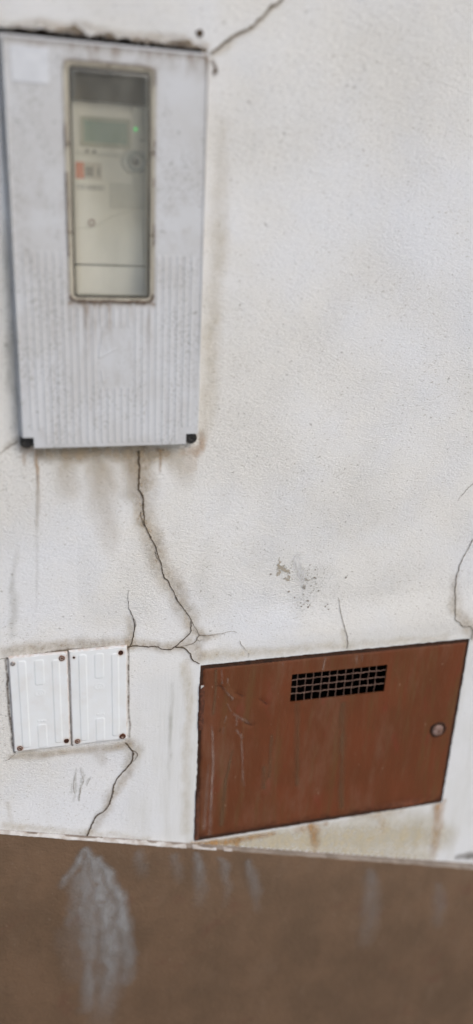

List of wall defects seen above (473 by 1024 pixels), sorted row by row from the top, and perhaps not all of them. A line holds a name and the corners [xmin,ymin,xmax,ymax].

crack [210,0,283,55]
crack [127,451,249,664]
crack [455,540,473,640]
crack [86,743,138,836]
leakage [77,849,128,951]